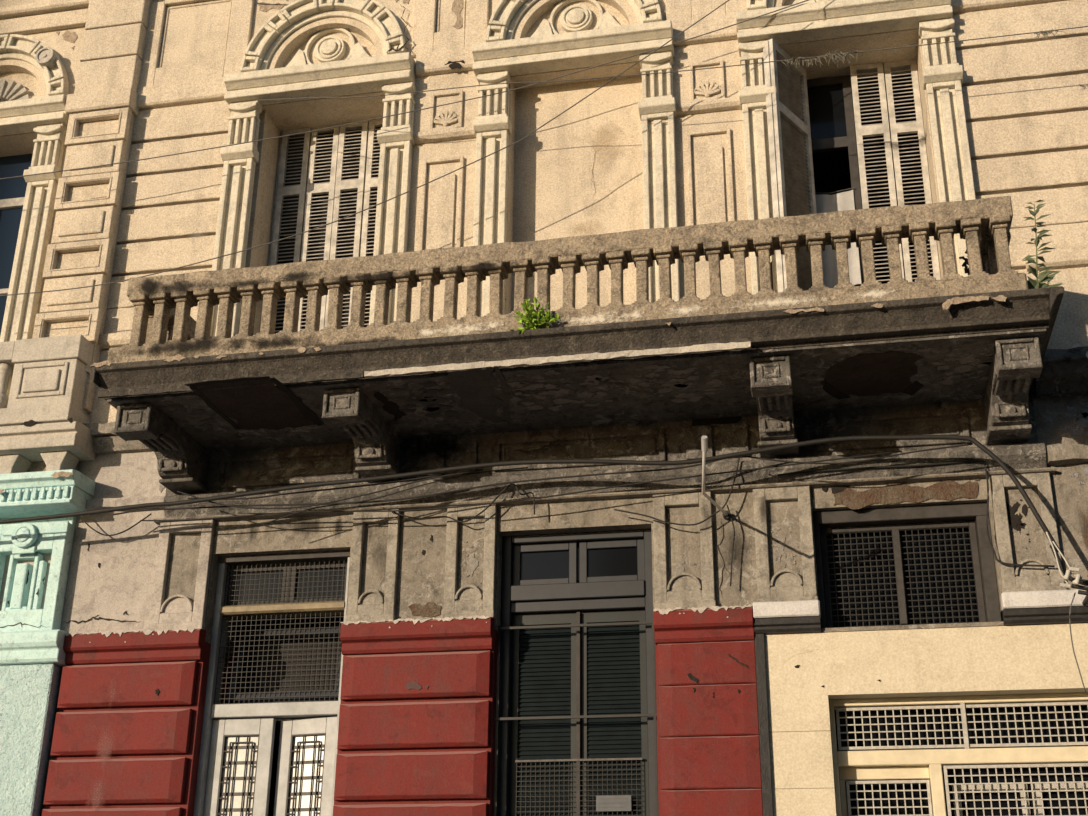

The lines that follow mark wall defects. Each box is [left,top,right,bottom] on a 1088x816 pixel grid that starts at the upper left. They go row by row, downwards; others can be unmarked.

peeling [451,0,464,29]
leakage [449,262,495,271]
leakage [140,279,211,297]
leakage [227,278,264,286]
leakage [282,272,311,281]
leakage [333,271,408,281]
spalling [942,295,1007,310]
spalling [820,351,924,400]
crack [0,611,136,628]
peeling [340,602,490,628]
peeling [64,627,195,643]